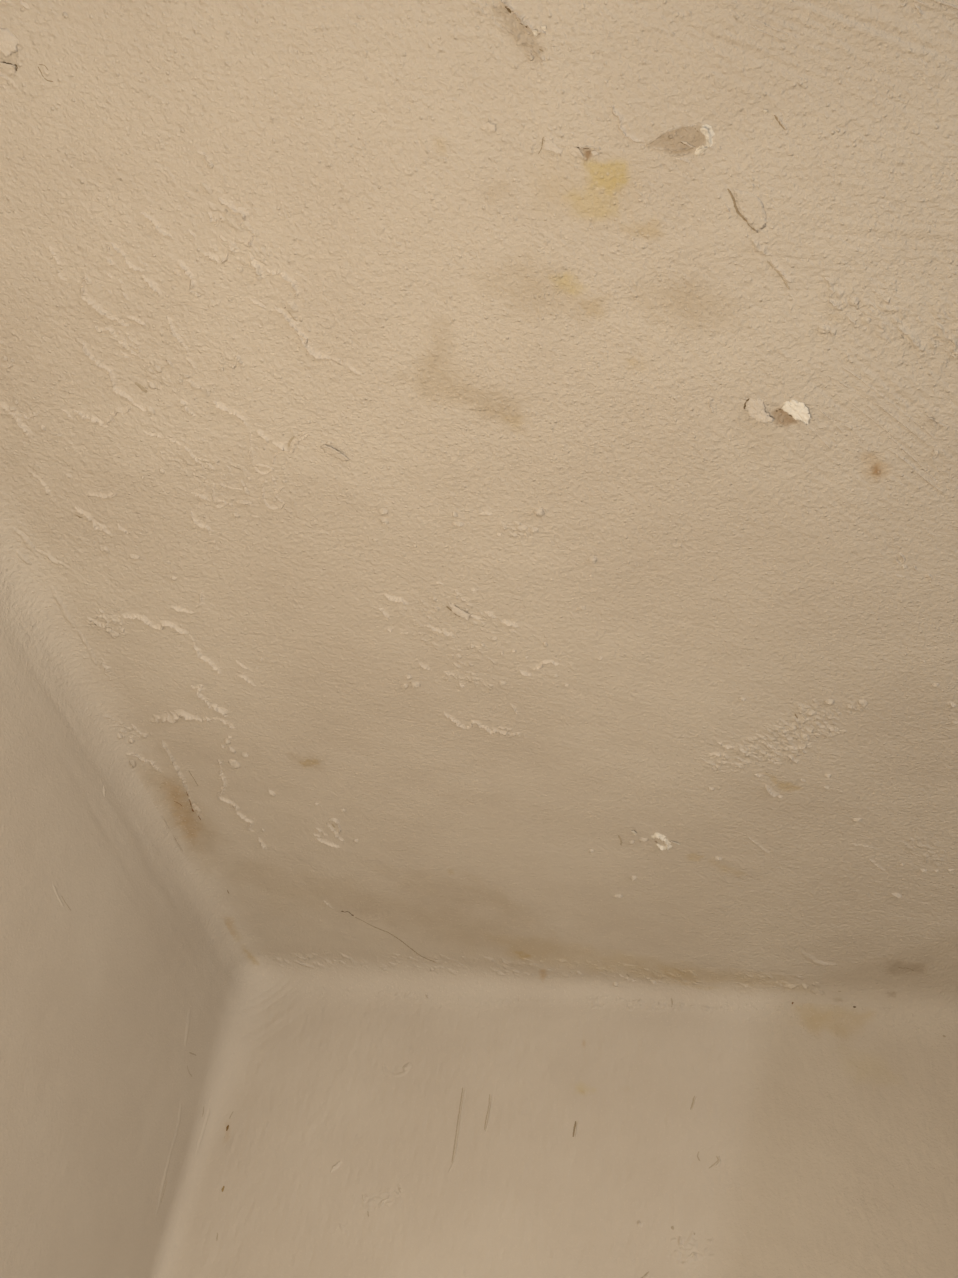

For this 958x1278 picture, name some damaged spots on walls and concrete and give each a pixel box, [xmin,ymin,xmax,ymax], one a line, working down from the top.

peeling [0,28,23,93]
peeling [643,121,715,164]
damp [383,133,764,440]
peeling [727,397,811,477]
peeling [122,591,222,675]